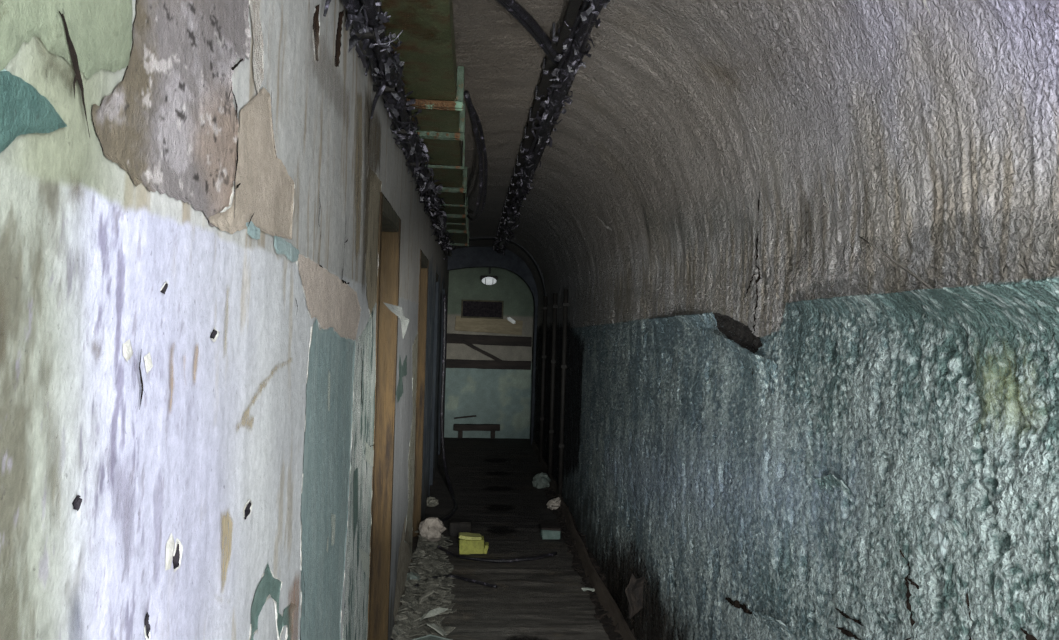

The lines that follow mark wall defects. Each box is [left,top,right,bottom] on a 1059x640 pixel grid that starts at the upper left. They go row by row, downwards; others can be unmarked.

crack [59,11,90,137]
flaking render [0,0,295,240]
peeling [792,278,1059,354]
peeling [123,339,153,374]
peeling [249,171,418,640]
spalling [72,495,82,511]
spalling [243,499,253,520]
peeling [165,533,183,572]